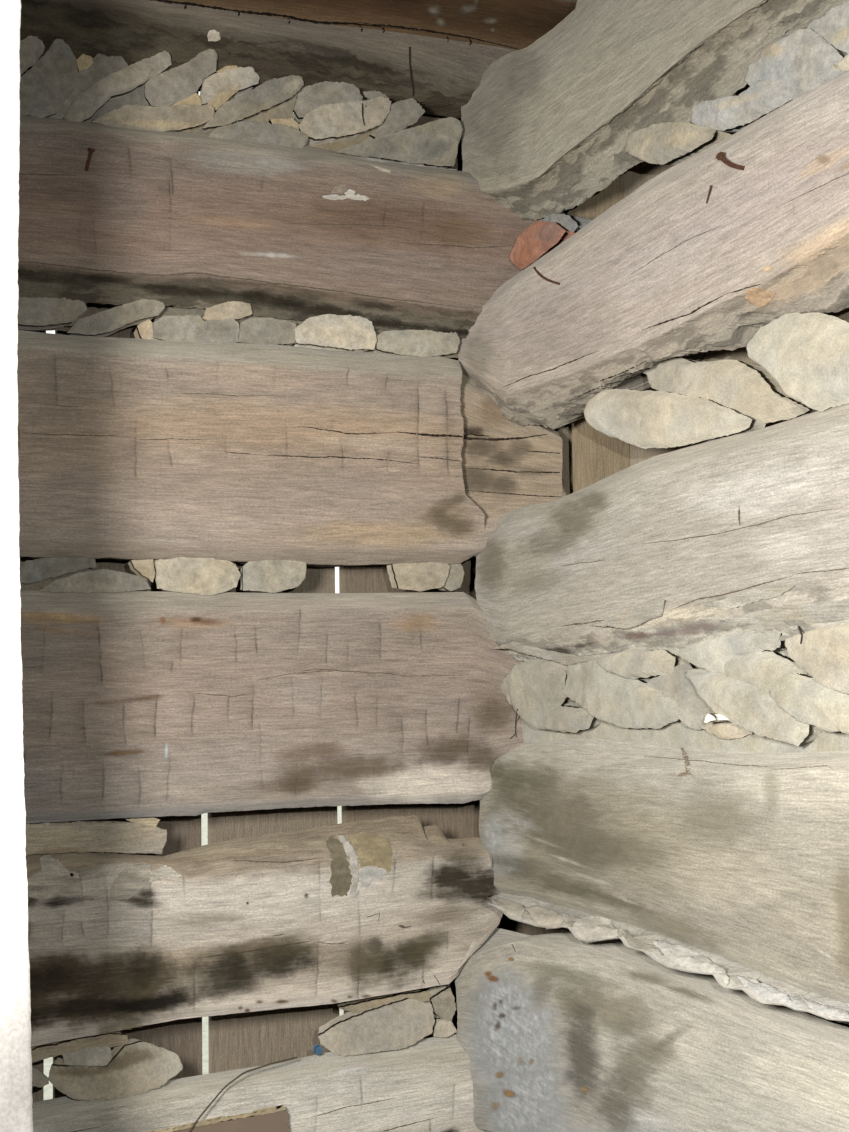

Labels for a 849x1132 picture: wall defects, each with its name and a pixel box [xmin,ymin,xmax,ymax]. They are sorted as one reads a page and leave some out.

crack [150,0,516,49]
crack [642,284,760,330]
crack [504,351,597,387]
crack [228,426,560,497]
crack [674,568,848,609]
rust [677,747,693,777]
peeling [326,833,397,898]
flaking render [487,892,849,1022]
leakage [30,971,70,992]
leakage [200,982,244,996]
leakage [57,992,189,1033]
leakage [567,1008,596,1088]